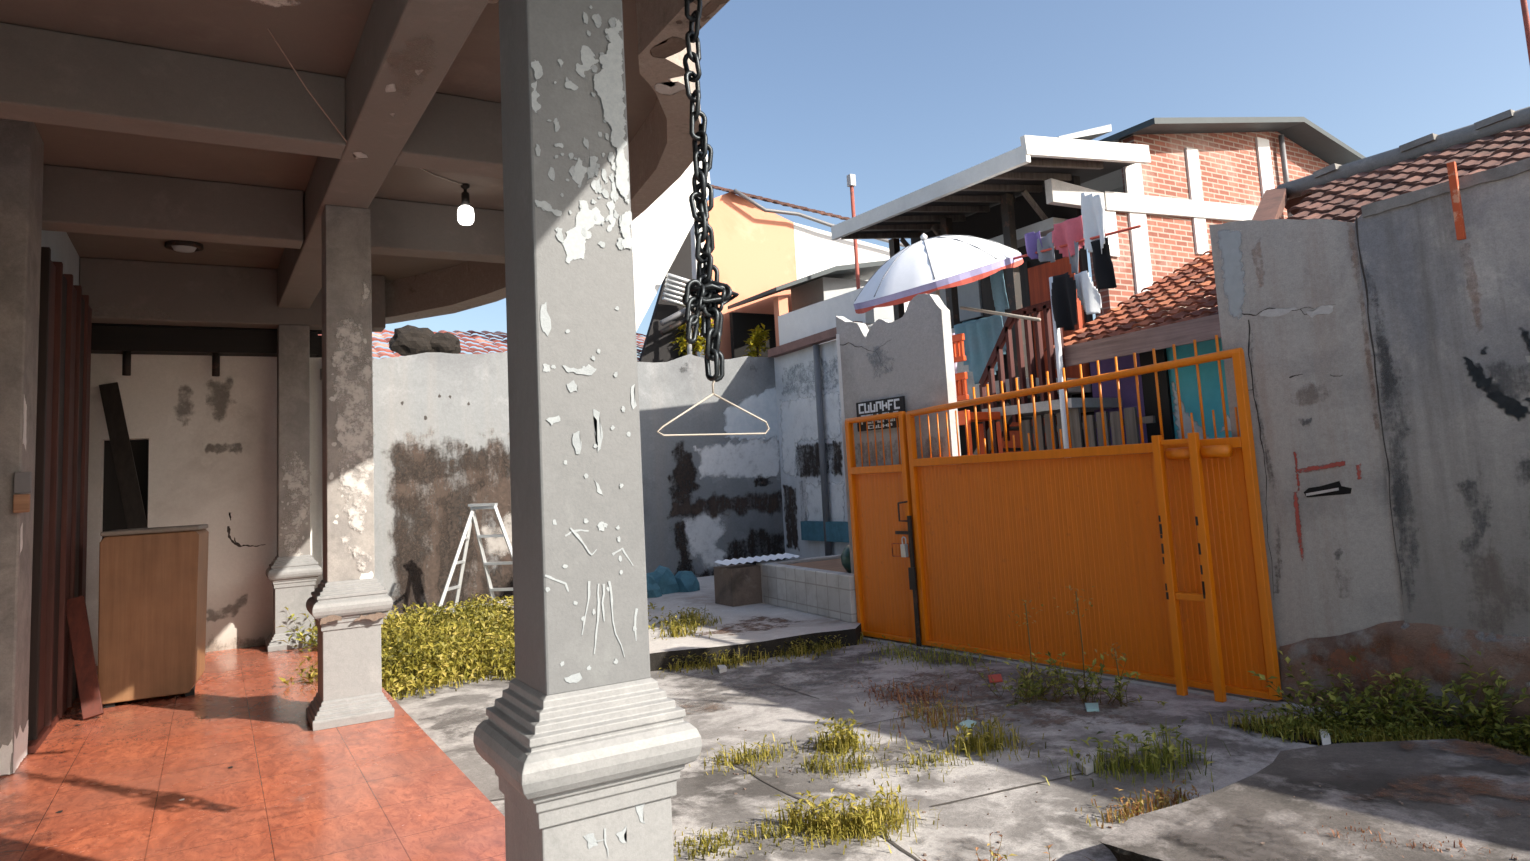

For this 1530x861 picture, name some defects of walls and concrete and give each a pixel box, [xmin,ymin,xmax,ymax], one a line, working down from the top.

peeling [329,318,374,579]
water stain [387,440,513,613]
peeling [540,302,570,336]
peeling [543,349,600,393]
peeling [545,518,638,683]
peeling [563,384,637,465]